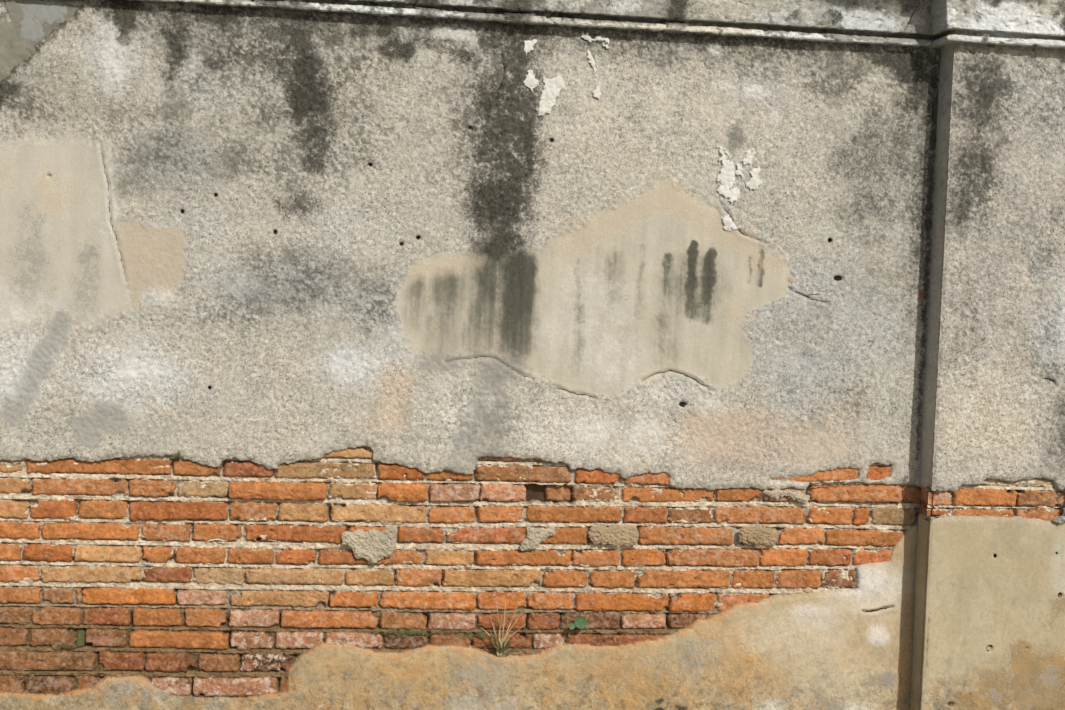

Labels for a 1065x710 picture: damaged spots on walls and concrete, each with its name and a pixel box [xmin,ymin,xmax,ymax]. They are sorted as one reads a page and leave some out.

peeling [524,39,537,55]
peeling [524,68,565,116]
peeling [581,31,610,98]
crack [100,148,126,279]
leakage [132,0,554,475]
peeling [392,145,794,397]
leakage [662,240,717,323]
leakage [749,249,765,287]
leakage [826,33,1010,459]
spalling [0,446,1065,698]